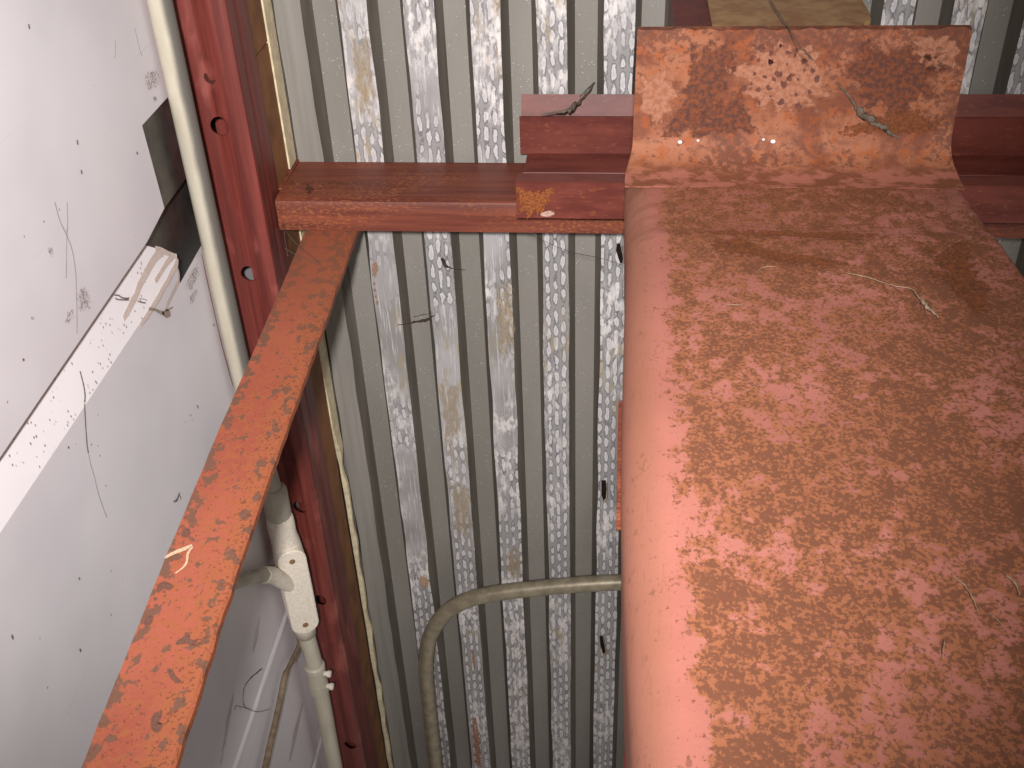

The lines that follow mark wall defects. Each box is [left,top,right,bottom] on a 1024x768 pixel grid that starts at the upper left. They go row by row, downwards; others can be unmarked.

corrosion [661,40,758,138]
corrosion [837,39,944,137]
corrosion [516,185,558,219]
corrosion [696,229,879,267]
corrosion [202,256,233,385]